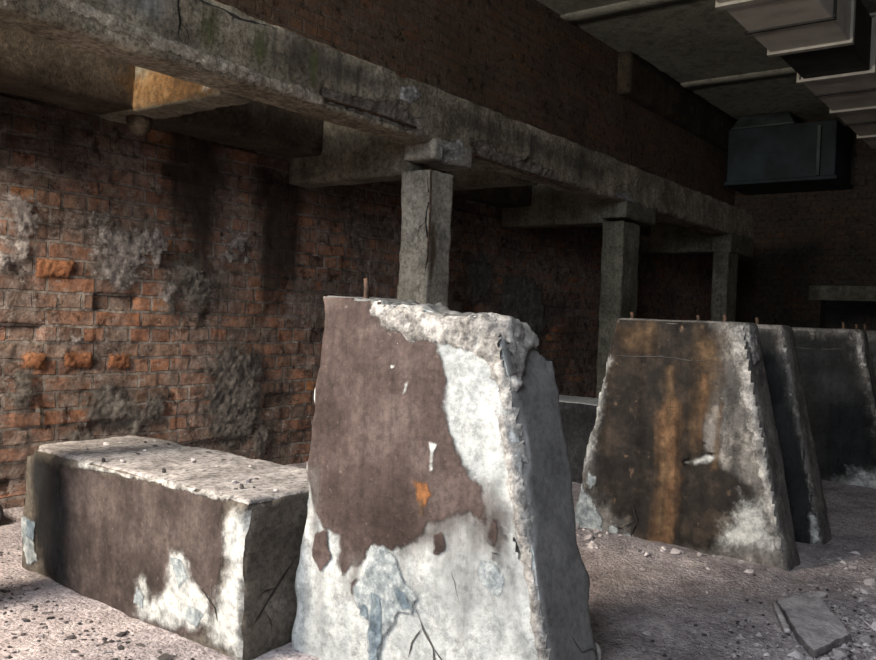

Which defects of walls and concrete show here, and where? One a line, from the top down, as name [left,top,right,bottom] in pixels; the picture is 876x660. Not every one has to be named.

peeling [0,192,76,279]
peeling [199,339,269,458]
peeling [307,270,553,660]
water stain [602,332,642,516]
corrosion [651,368,678,544]
water stain [675,323,775,550]
peeling [21,458,251,657]
crack [408,604,442,660]